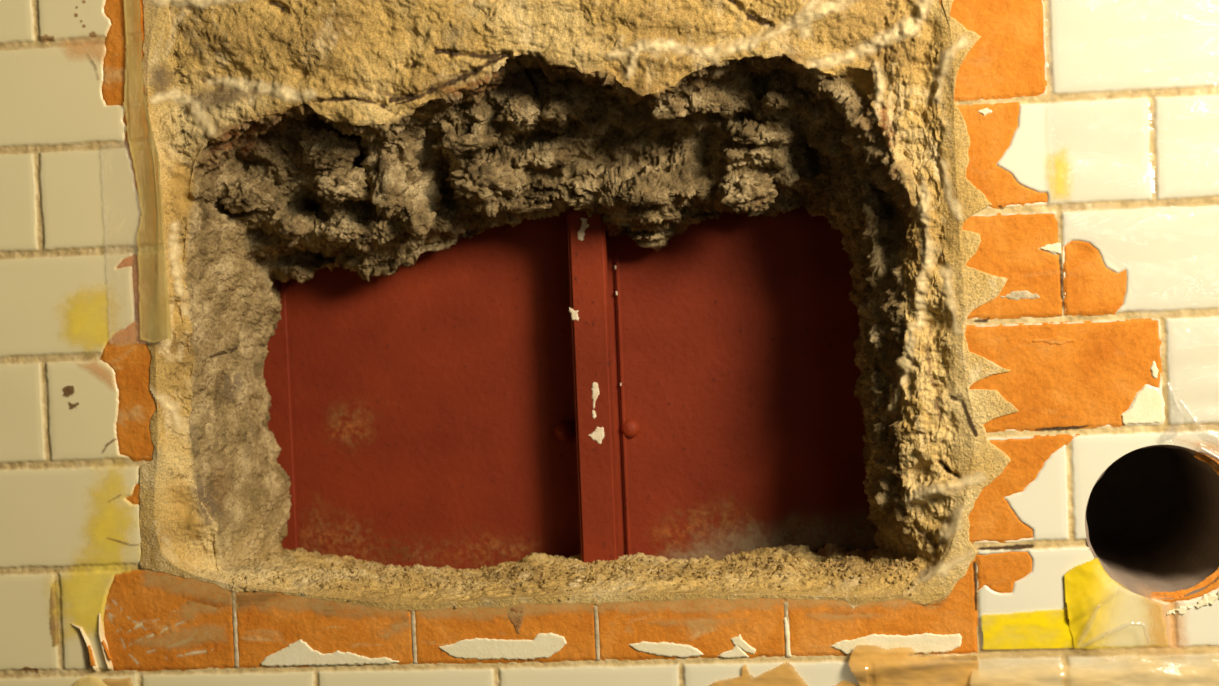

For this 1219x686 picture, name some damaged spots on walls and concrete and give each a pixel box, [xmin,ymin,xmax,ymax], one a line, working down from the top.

crack [317,49,568,114]
peeling [1038,242,1061,254]
spalling [183,53,921,569]
peeling [1121,361,1165,426]
peeling [261,639,399,667]
peeling [439,633,567,660]
peeling [629,634,756,658]
peeling [830,633,962,655]